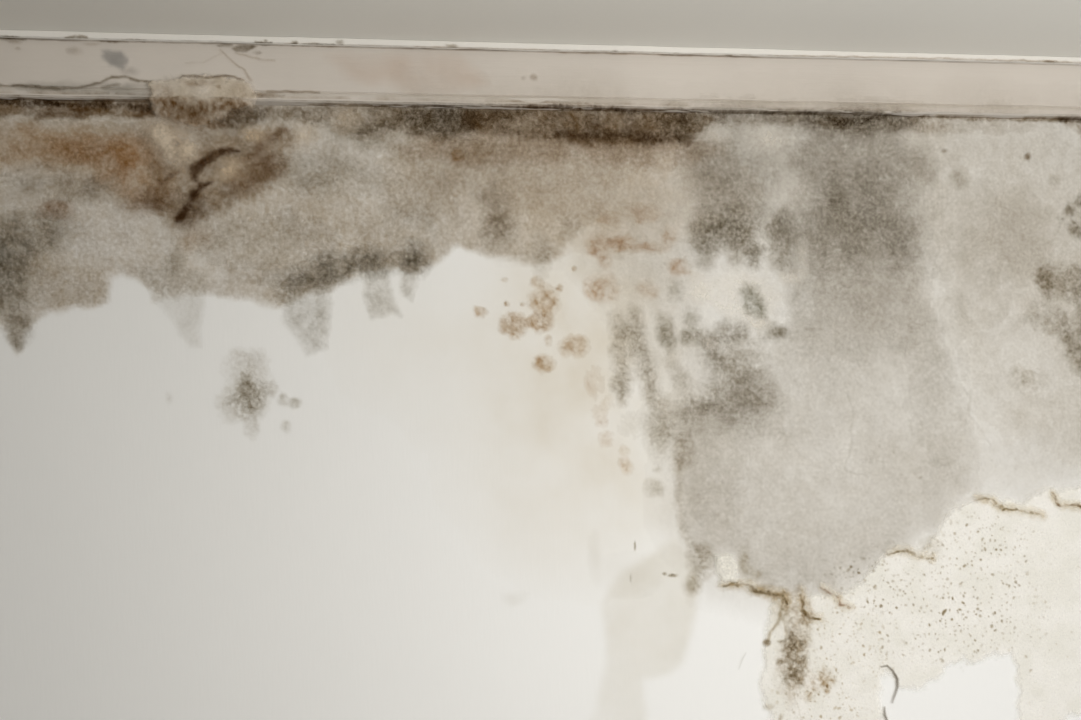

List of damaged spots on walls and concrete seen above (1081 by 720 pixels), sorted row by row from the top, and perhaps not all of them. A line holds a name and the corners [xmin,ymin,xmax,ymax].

leakage [34,100,109,117]
peeling [761,488,1081,720]